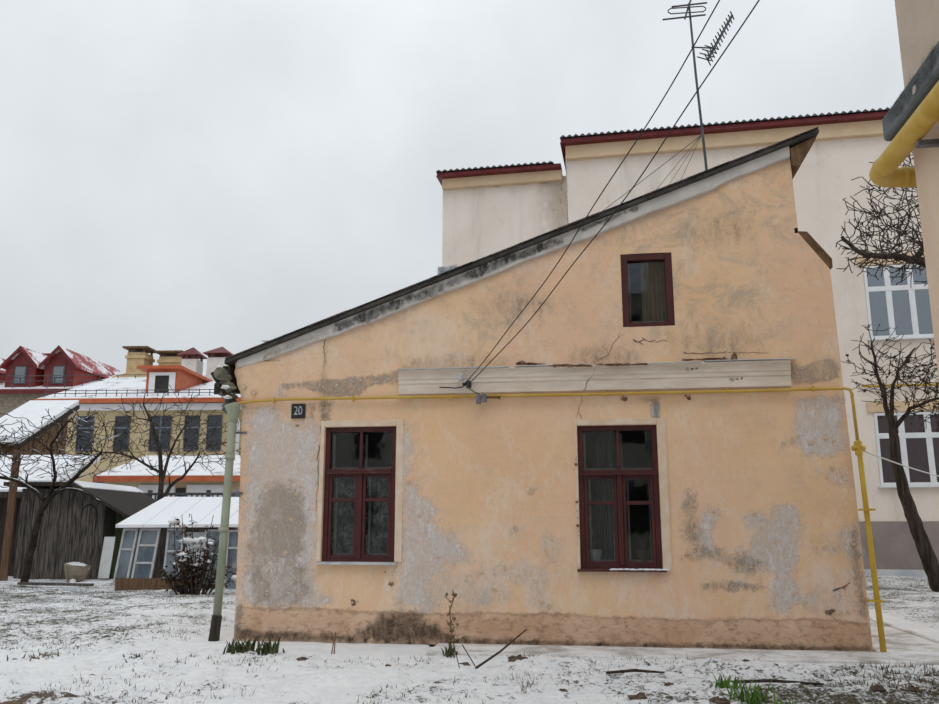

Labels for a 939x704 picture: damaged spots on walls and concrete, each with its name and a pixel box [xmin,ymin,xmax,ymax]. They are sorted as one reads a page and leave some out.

crack [576,333,757,418]
damp [237,628,311,640]
damp [323,613,486,644]